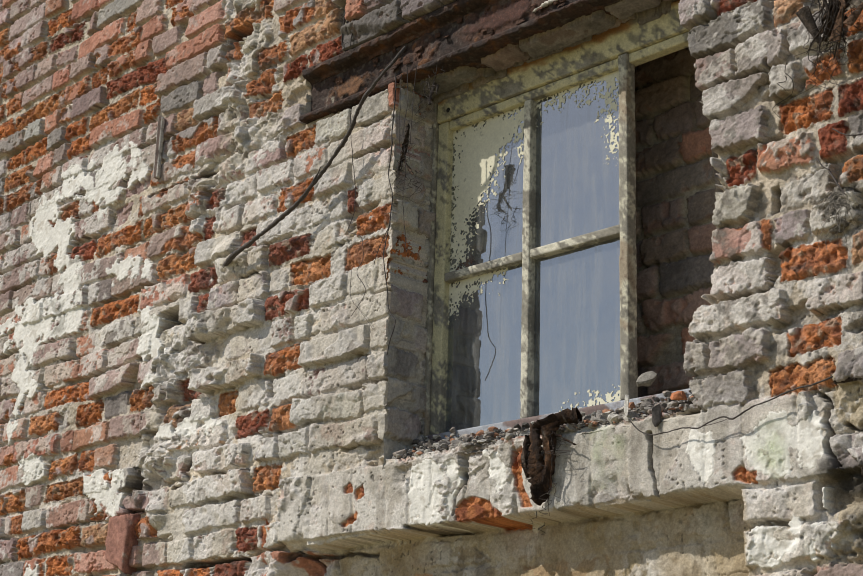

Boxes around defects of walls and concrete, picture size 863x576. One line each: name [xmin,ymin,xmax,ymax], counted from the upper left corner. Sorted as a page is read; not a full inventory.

spalling [165,0,194,26]
spalling [224,0,274,61]
spalling [244,0,343,119]
rust [328,75,367,96]
rust [456,0,566,39]
spalling [203,188,226,241]
spalling [241,228,258,249]
peeling [0,58,218,576]
spalling [156,378,296,440]
peeling [408,447,532,527]